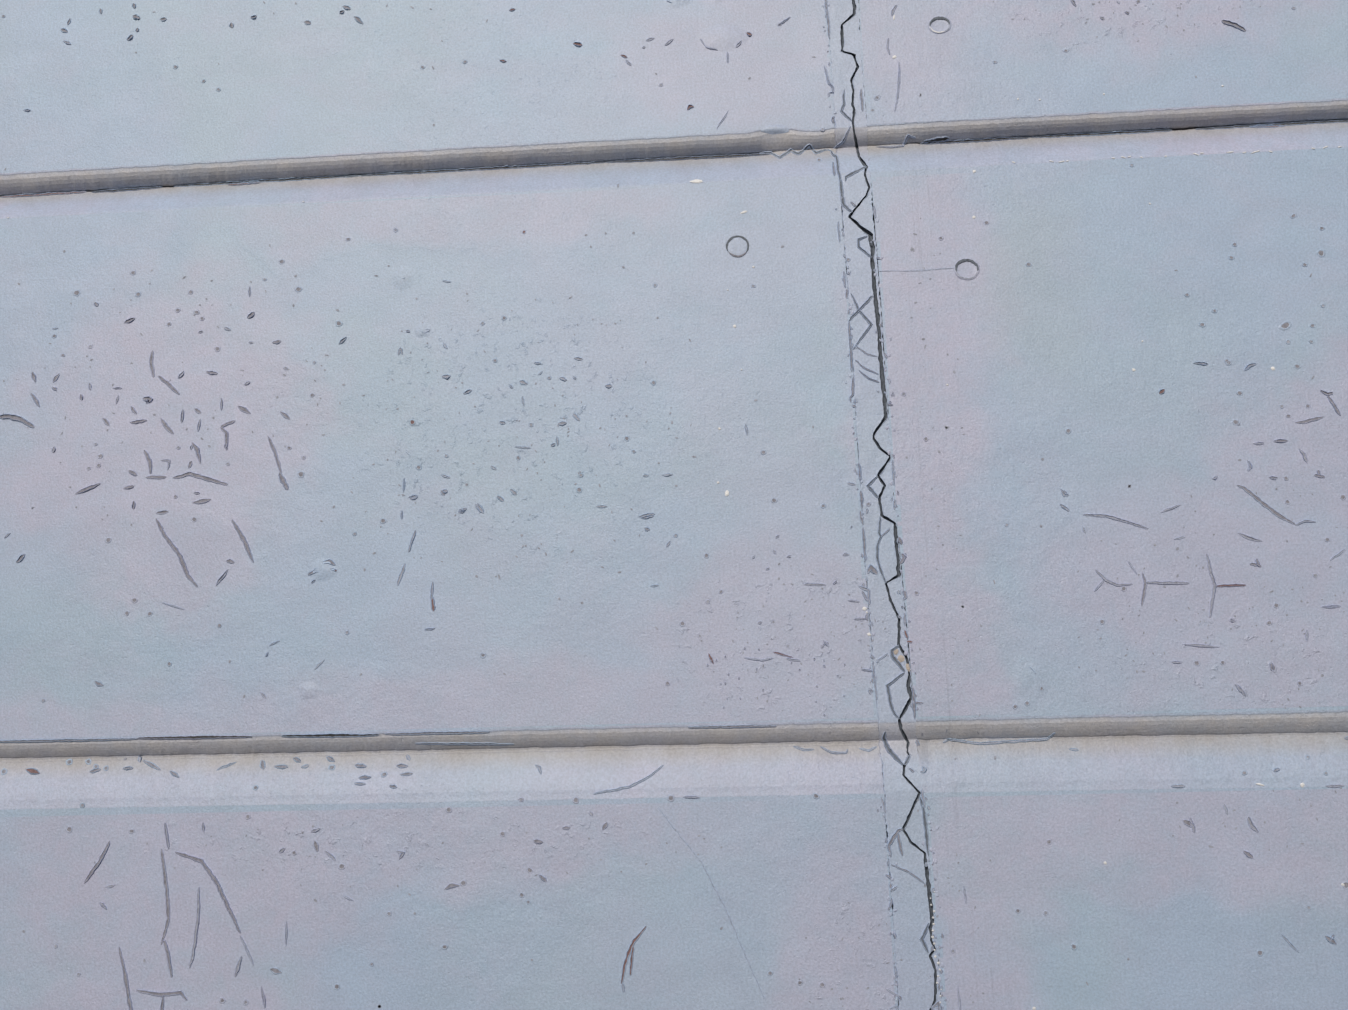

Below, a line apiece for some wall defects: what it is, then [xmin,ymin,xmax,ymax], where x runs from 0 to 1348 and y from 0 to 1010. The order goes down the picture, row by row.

crack [1196,120,1348,130]
crack [879,129,1172,148]
crack [955,259,979,279]
crack [1320,390,1341,416]
crack [1314,470,1325,478]
crack [0,0,950,1010]
crack [1237,484,1316,526]
crack [1083,514,1148,529]
crack [1094,553,1261,618]
crack [943,732,1056,745]
crack [1183,818,1196,833]
crack [1223,804,1259,833]